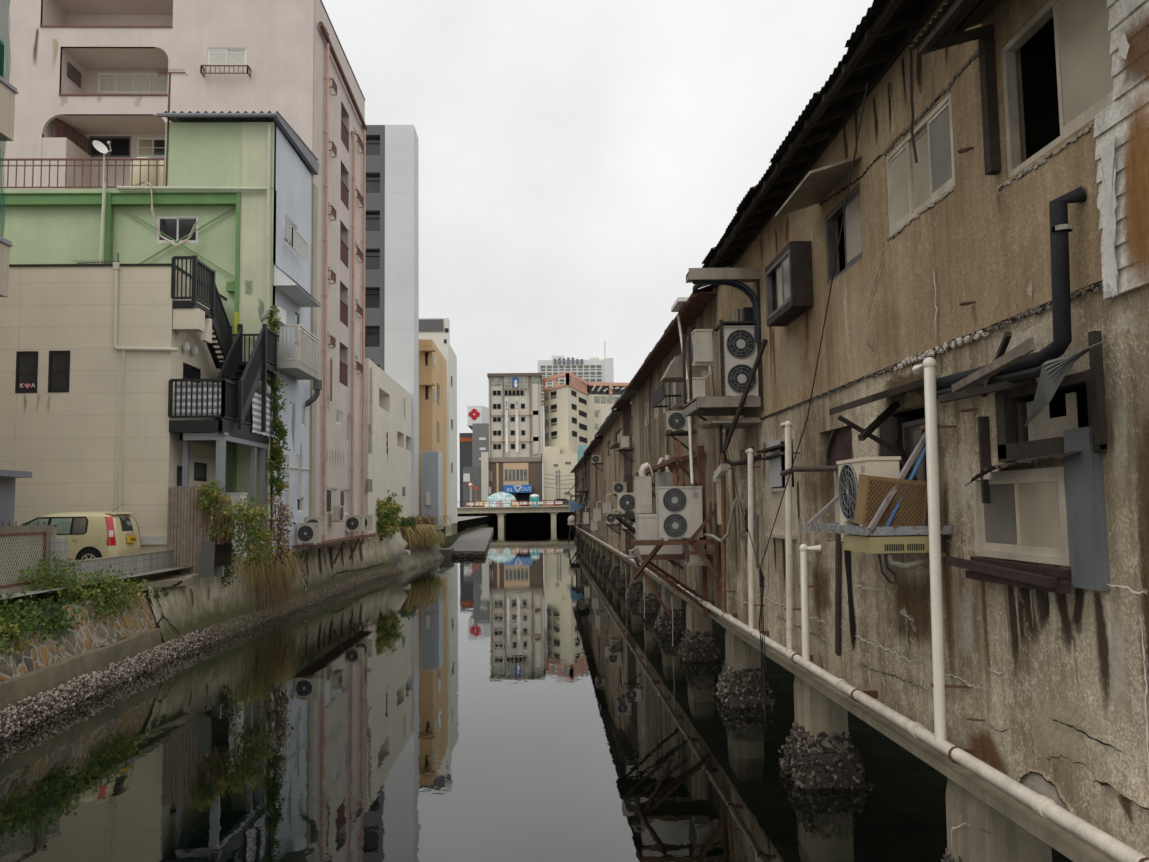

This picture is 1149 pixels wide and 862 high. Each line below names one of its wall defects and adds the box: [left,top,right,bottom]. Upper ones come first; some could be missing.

leakage [843,47,948,159]
peeling [1119,33,1130,59]
peeling [1097,134,1118,294]
corrosion [1123,102,1149,276]
leakage [1006,585,1126,698]
crack [1046,582,1149,789]